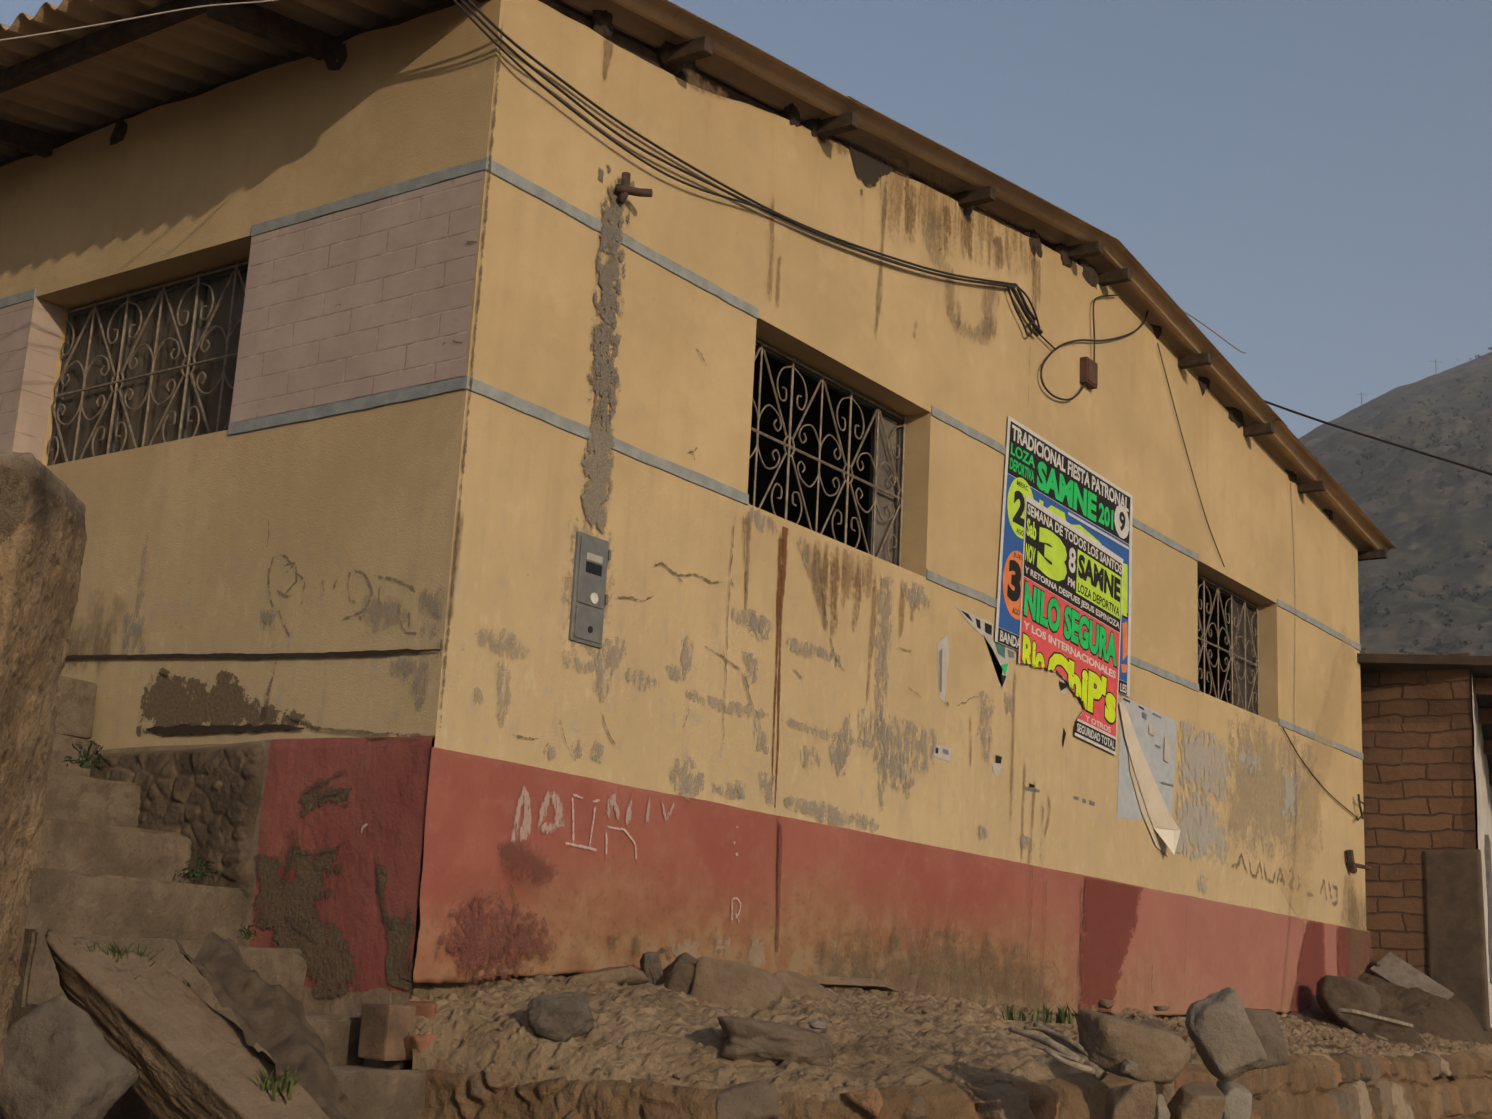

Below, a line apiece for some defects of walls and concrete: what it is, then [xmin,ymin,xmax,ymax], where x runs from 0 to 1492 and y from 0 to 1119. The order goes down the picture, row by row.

flaking render [89,668,359,1000]
peeling [543,740,604,764]
peeling [592,636,694,702]
peeling [669,573,937,831]
peeling [977,691,1015,761]
peeling [1171,720,1263,893]
peeling [376,856,415,991]